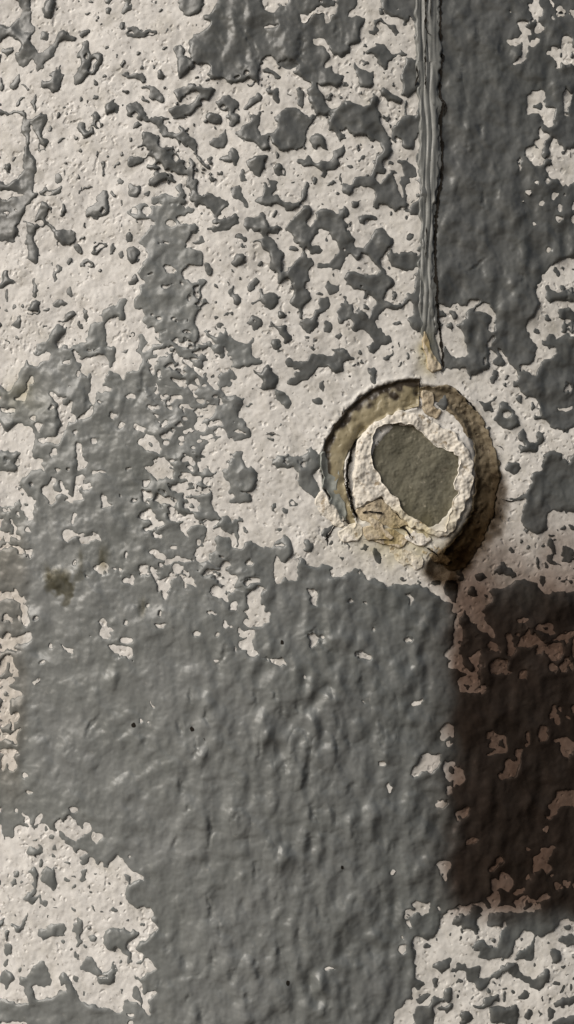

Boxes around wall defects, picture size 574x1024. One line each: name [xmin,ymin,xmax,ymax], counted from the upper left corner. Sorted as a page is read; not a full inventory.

peeling [0,0,574,669]
peeling [0,589,38,794]
peeling [0,807,158,1024]
peeling [411,723,459,821]
peeling [436,861,450,881]
peeling [393,901,574,1024]